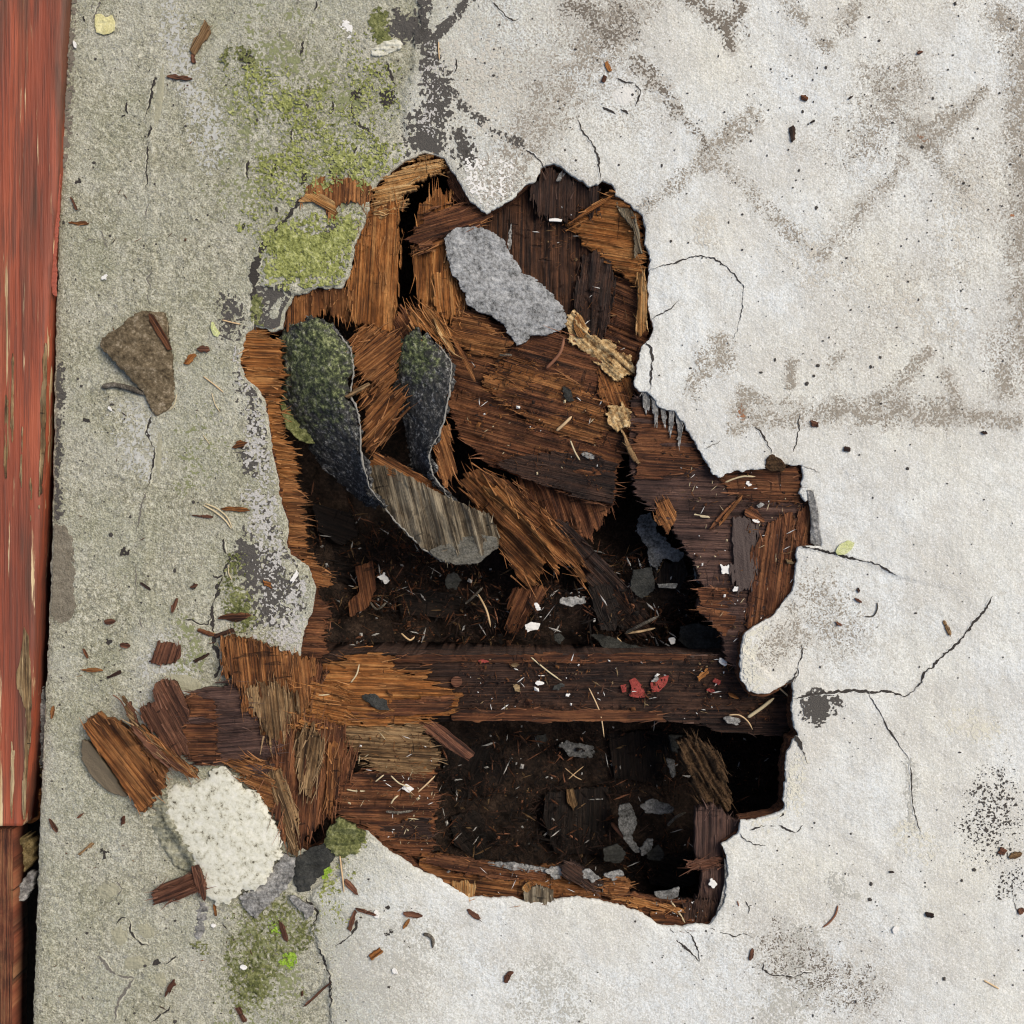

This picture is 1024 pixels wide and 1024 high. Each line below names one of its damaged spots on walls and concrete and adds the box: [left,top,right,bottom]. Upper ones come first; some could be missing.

water stain [431,0,1024,440]
peeling [214,284,292,342]
crack [650,255,745,337]
peeling [232,357,270,478]
peeling [227,494,310,629]
peeling [636,513,684,570]
peeling [807,490,821,546]
peeling [559,596,586,607]
peeling [559,740,595,758]
crack [785,596,993,839]
peeling [603,798,674,863]
crack [740,813,803,846]